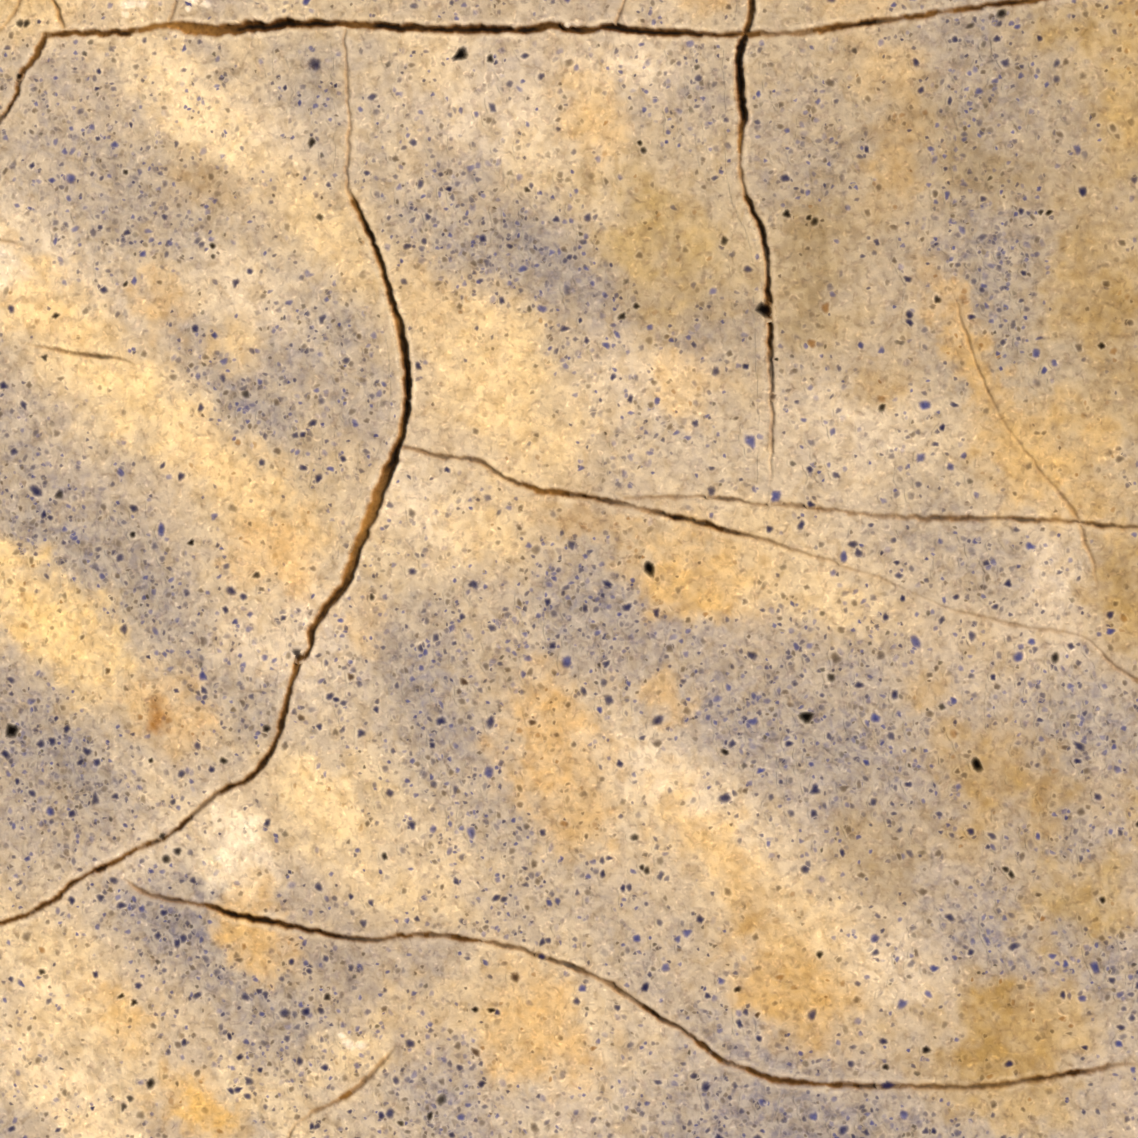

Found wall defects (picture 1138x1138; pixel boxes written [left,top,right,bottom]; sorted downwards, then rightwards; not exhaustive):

crack [0,184,423,937]
crack [0,0,1138,691]
crack [270,1033,403,1138]
crack [115,869,1138,1102]